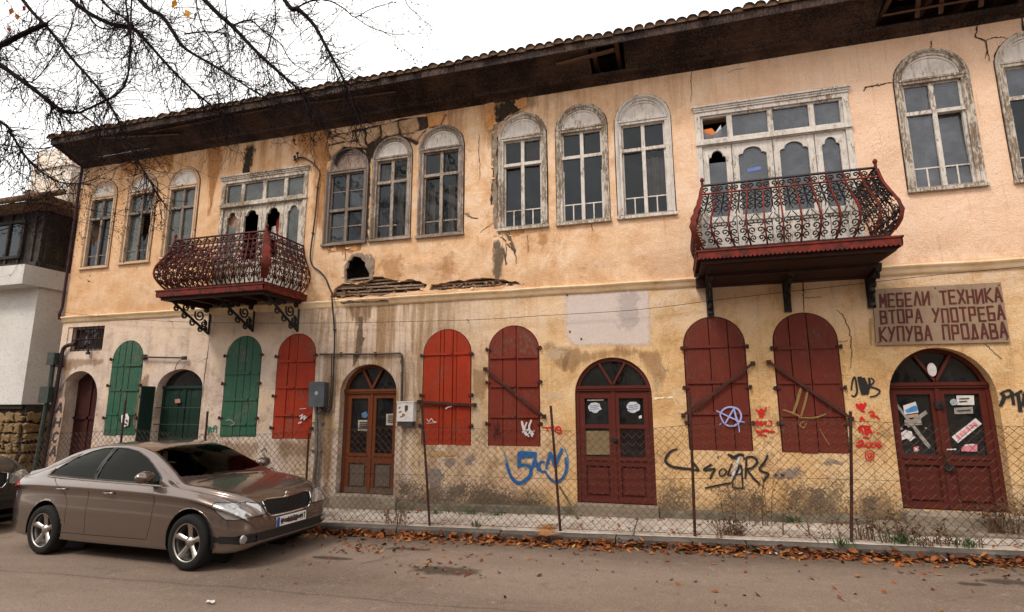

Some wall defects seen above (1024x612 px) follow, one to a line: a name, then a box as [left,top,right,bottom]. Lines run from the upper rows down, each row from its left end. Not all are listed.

crack [975,17,1024,61]
flaking render [514,97,527,109]
flaking render [485,102,524,244]
flaking render [328,246,374,283]
crack [802,283,852,370]